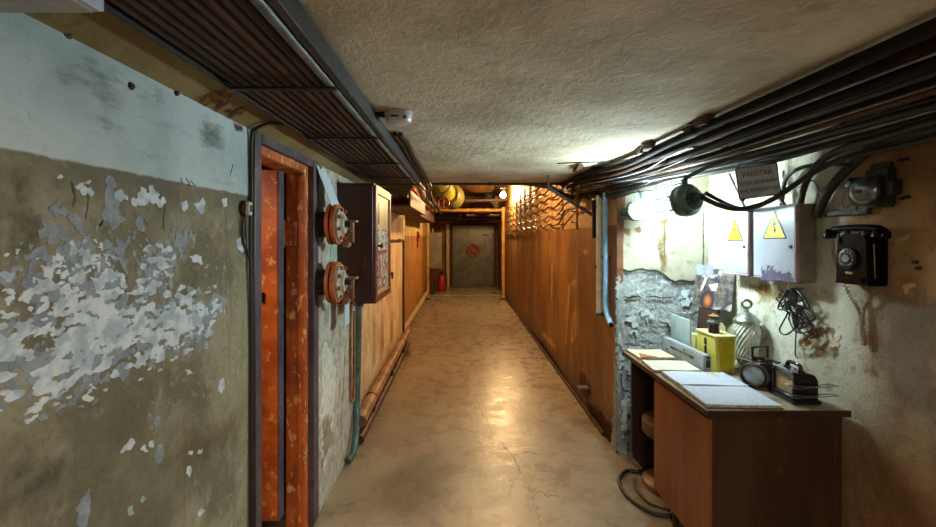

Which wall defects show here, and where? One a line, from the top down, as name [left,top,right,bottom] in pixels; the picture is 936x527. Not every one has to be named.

peeling [0,175,227,424]
spalling [610,268,699,454]
crack [475,400,552,525]